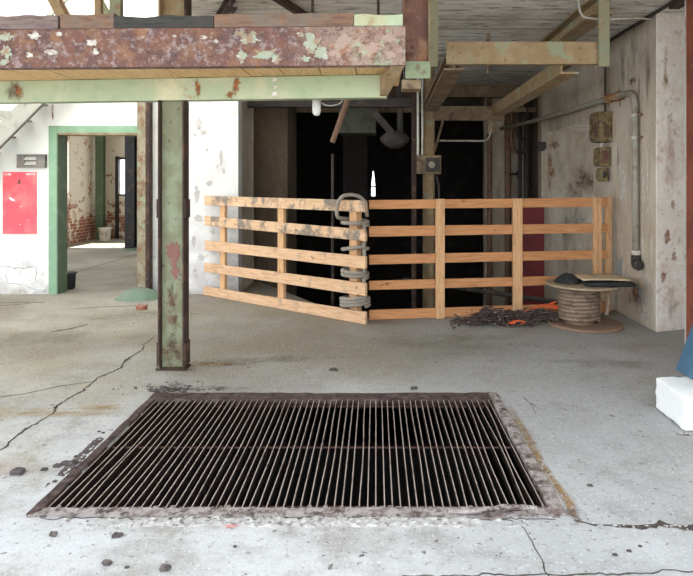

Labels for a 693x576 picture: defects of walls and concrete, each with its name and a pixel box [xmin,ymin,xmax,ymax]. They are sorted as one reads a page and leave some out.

peeling [0,31,15,66]
peeling [233,31,282,65]
crack [0,338,152,450]
crack [41,514,134,522]
crack [402,517,693,576]